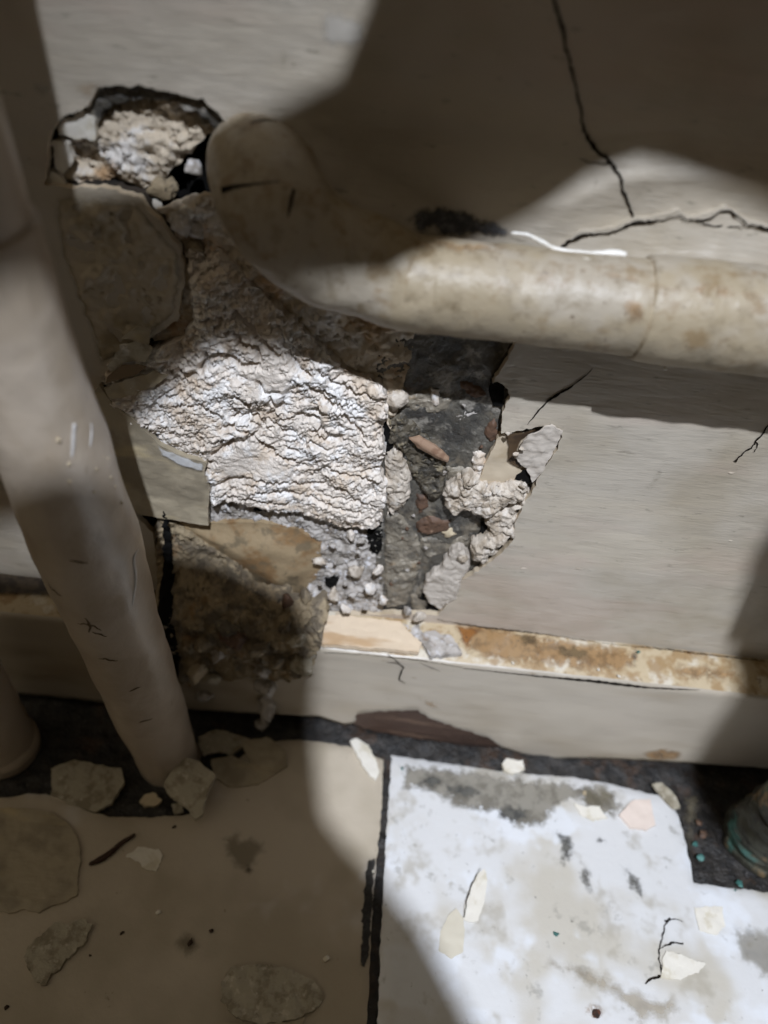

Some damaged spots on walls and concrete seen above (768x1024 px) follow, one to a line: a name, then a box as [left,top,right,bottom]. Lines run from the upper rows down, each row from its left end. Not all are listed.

crack [552,0,768,247]
flaking render [46,84,563,622]
crack [527,369,592,425]
leakage [405,766,621,826]